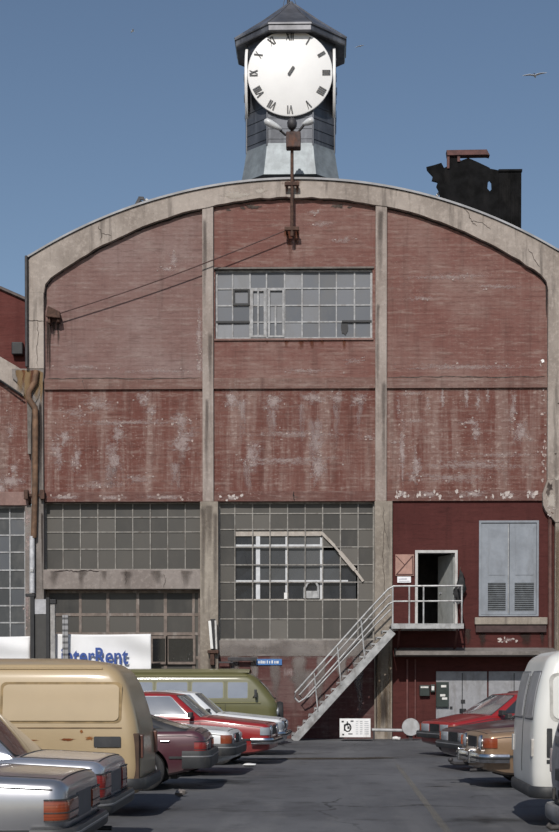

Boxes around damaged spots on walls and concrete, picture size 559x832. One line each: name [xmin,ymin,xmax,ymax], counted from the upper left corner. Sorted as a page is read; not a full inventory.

crack [28,199,364,387]
crack [389,208,547,317]
crack [388,373,544,381]
peeling [389,435,442,500]
peeling [455,482,513,499]
spalling [527,425,559,516]